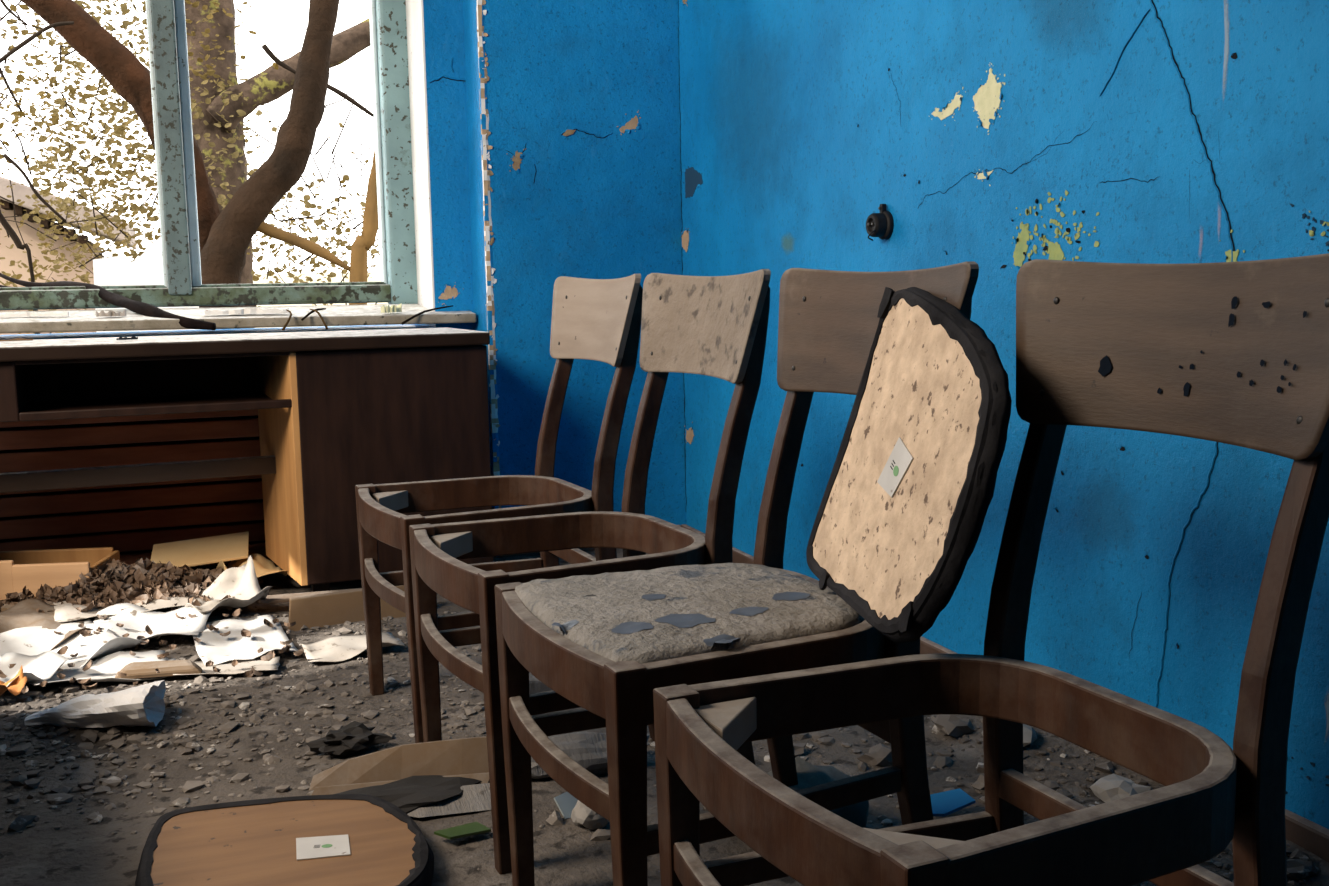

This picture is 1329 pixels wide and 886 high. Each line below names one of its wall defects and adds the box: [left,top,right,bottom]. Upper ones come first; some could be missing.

peeling [617,110,641,135]
peeling [929,63,1006,135]
crack [919,0,1235,262]
peeling [1000,190,1100,269]
peeling [1290,203,1329,251]
crack [1129,442,1218,708]